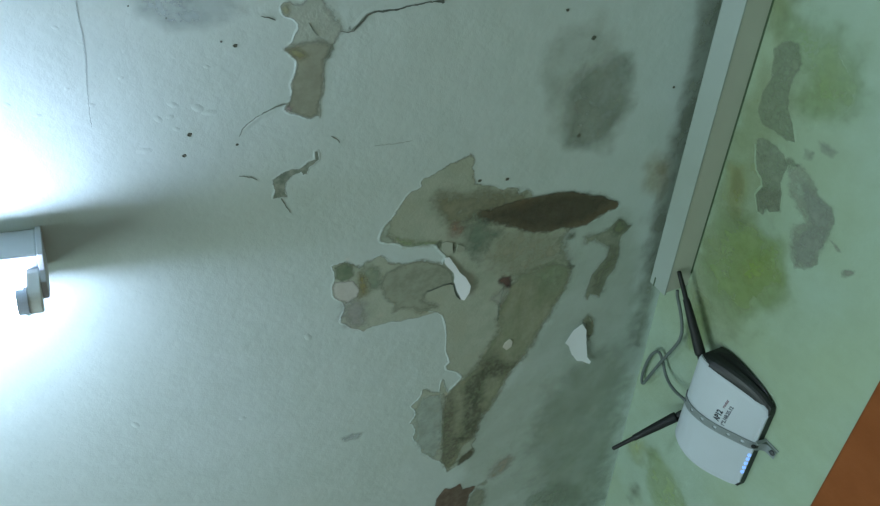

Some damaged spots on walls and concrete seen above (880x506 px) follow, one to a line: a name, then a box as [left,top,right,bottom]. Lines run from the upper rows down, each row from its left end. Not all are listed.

crack [340,0,446,33]
peeling [278,0,341,120]
crack [239,103,289,138]
peeling [271,149,321,212]
leakage [480,192,619,233]
peeling [330,155,619,473]
flaking render [435,484,484,506]